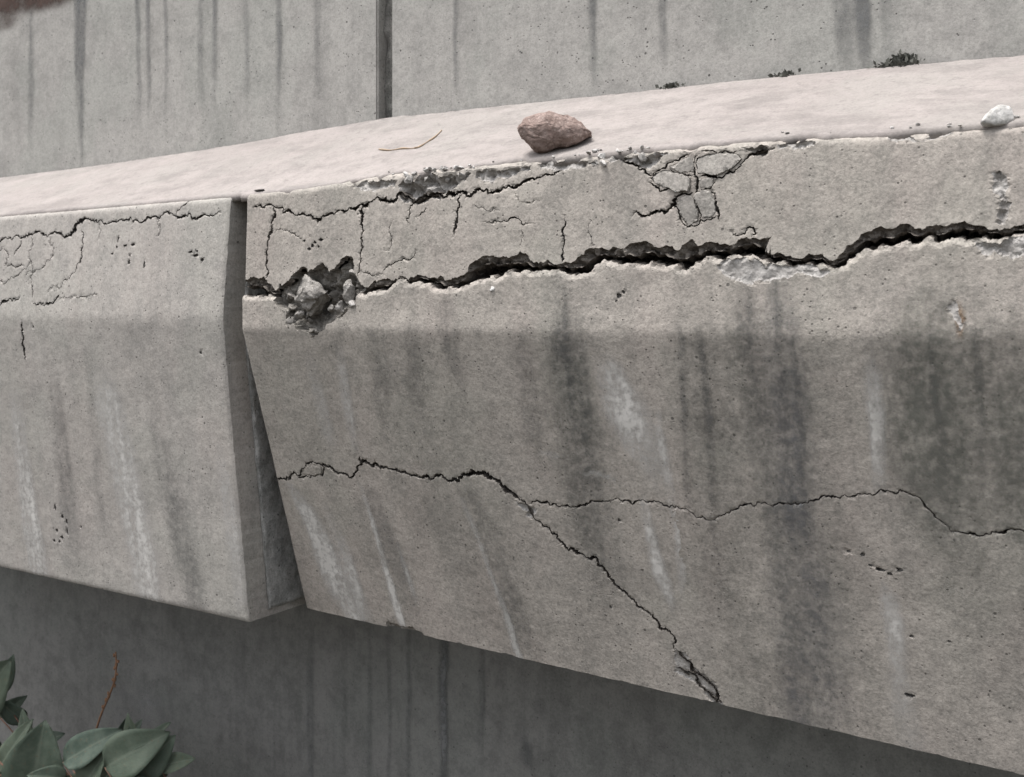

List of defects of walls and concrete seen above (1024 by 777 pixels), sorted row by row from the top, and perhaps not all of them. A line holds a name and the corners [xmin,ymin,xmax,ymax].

leakage [0,0,63,24]
crack [0,202,218,306]
spalling [273,259,366,338]
spalling [355,152,671,205]
crack [246,149,1024,297]
spalling [744,140,817,157]
leakage [605,363,670,482]
leakage [867,374,884,473]
leakage [292,493,365,621]
leakage [365,501,405,627]
crack [277,456,1024,703]
leakage [645,518,672,604]